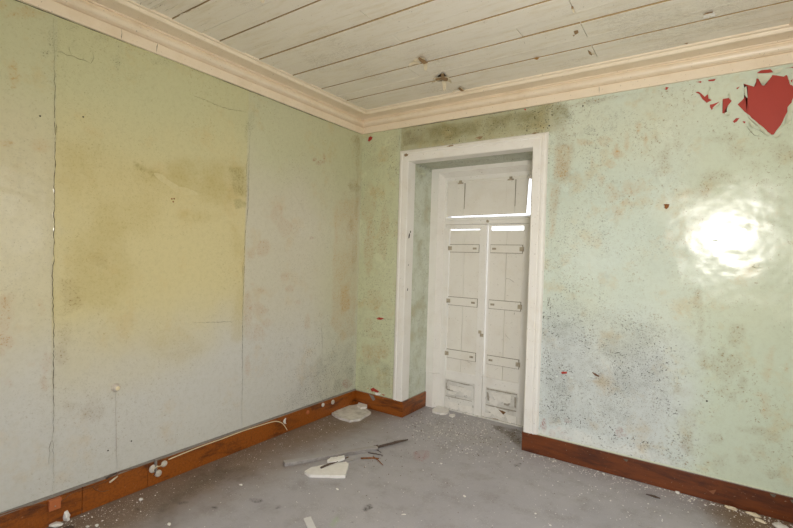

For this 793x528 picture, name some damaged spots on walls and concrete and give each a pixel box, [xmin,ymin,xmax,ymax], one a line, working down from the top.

peeling [696,67,793,138]
water stain [0,122,275,394]
crack [12,0,359,495]
water stain [279,90,793,414]
water stain [538,285,784,481]